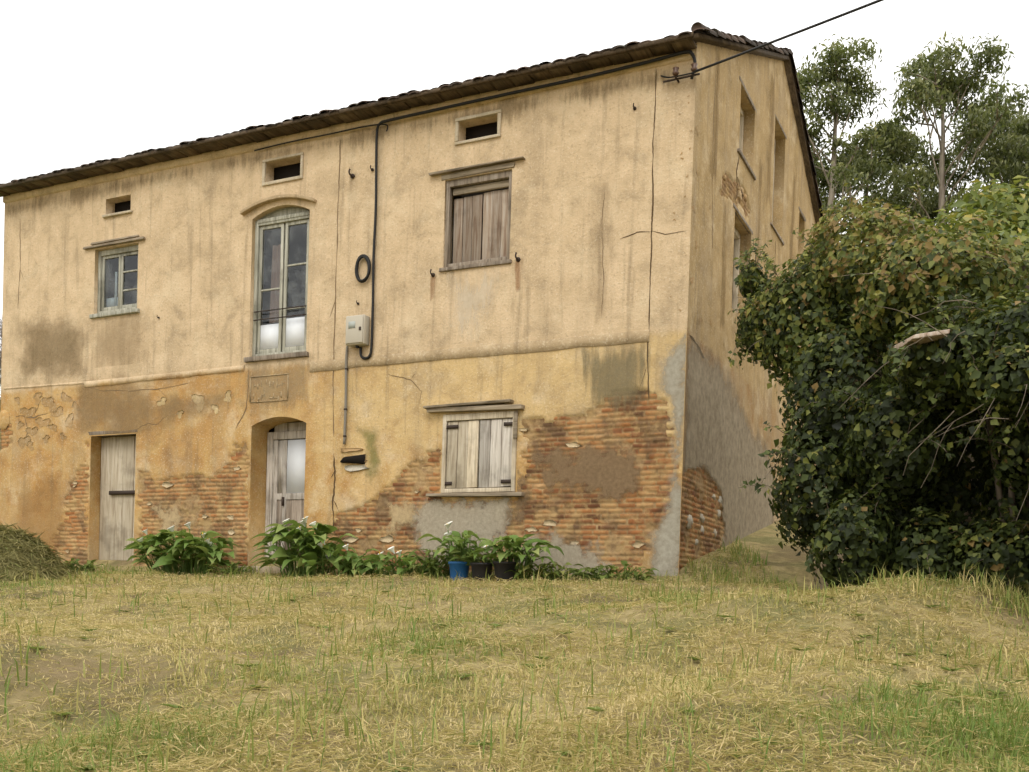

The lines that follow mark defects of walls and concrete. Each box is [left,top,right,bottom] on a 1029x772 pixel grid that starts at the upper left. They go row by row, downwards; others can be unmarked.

crack [601,71,683,398]
flaking render [1,391,80,451]
leakage [24,327,78,372]
leakage [583,351,644,404]
flaking render [50,460,90,565]
flaking render [138,444,250,568]
flaking render [328,390,724,575]